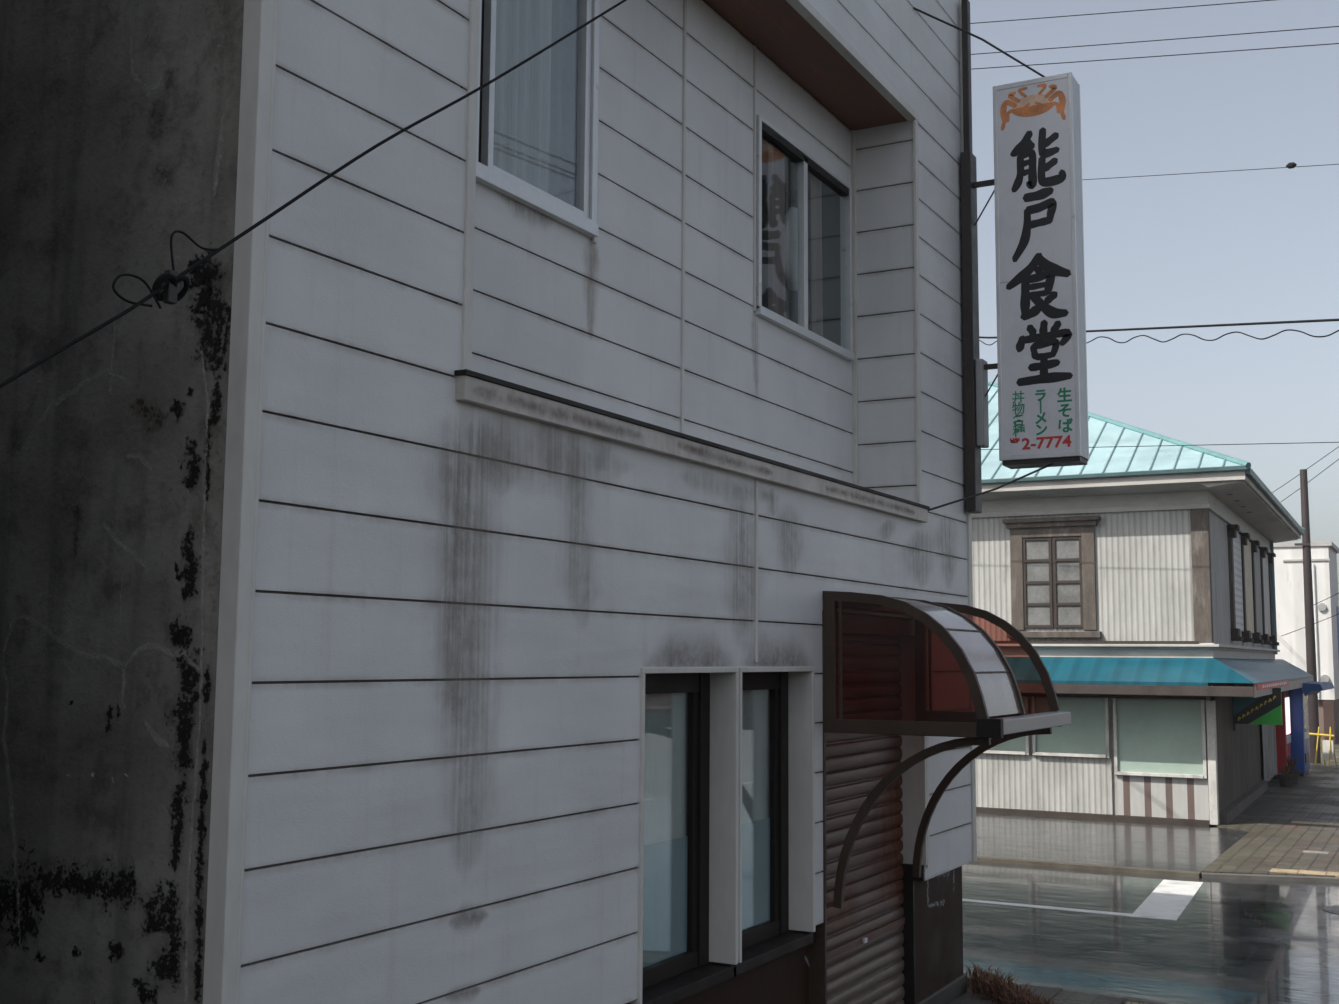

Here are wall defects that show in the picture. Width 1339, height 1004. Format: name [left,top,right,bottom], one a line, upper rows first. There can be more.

damp [0,839,187,1004]
crack [1,525,205,997]